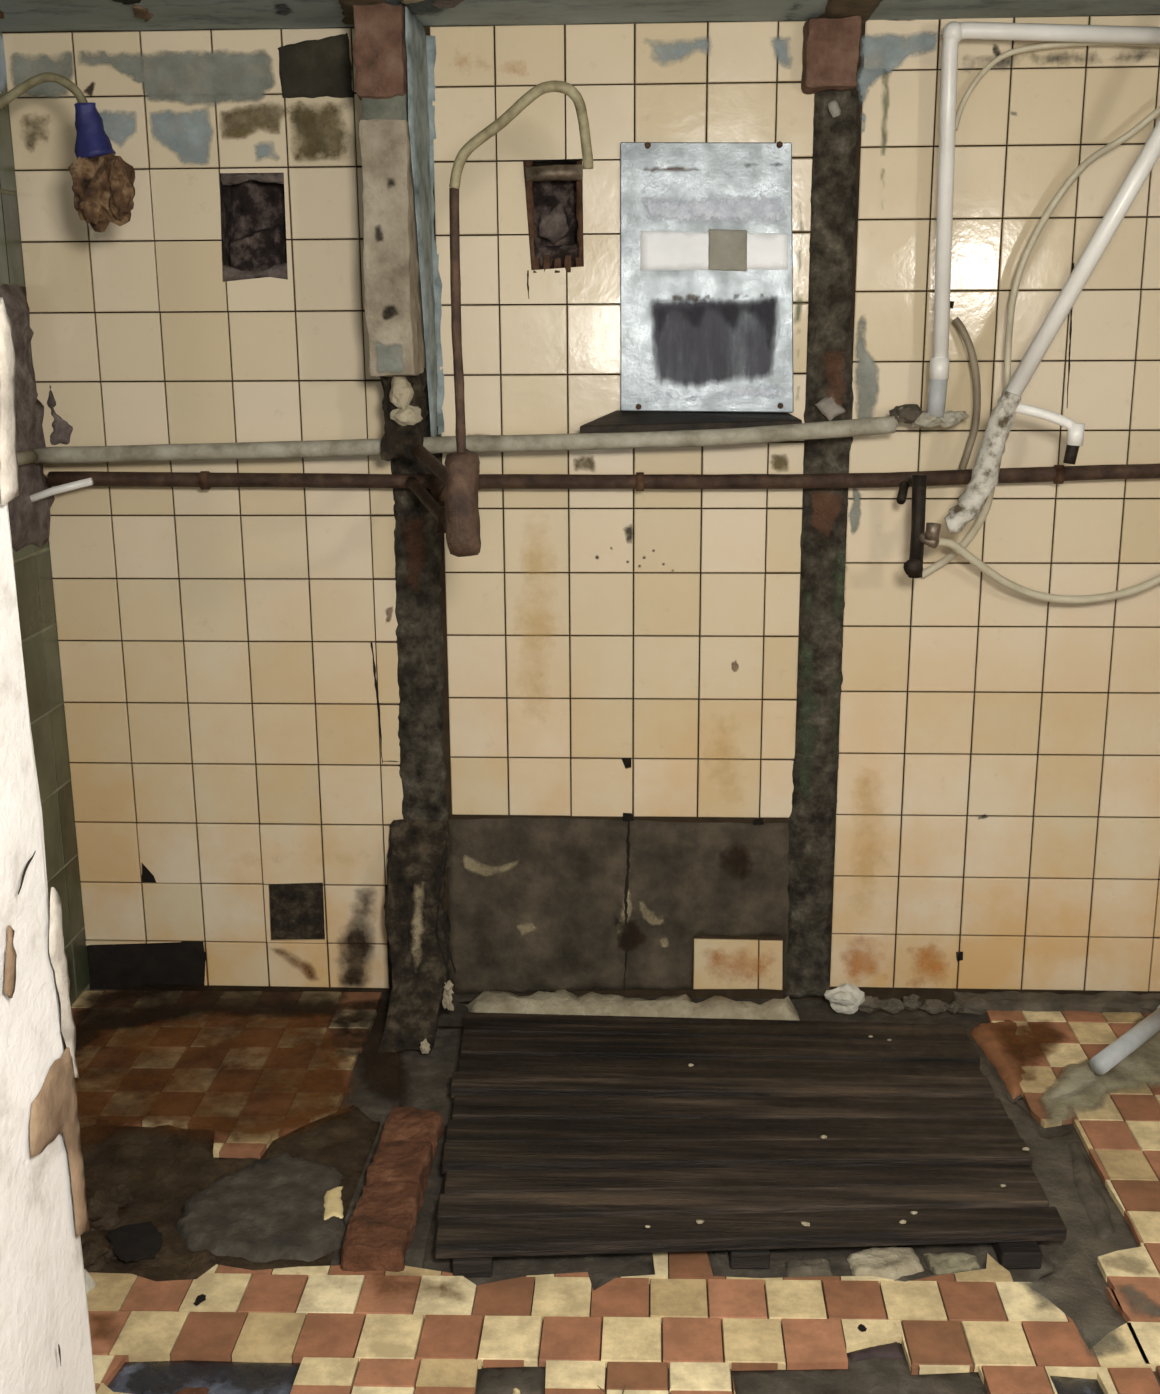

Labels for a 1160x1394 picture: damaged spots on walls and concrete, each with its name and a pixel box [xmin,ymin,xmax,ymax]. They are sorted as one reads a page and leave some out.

spalling [112,0,153,22]
peeling [275,4,291,15]
peeling [0,11,284,164]
peeling [4,925,17,998]
damp [62,895,405,1141]
peeling [107,1360,301,1394]
peeling [731,1324,987,1394]